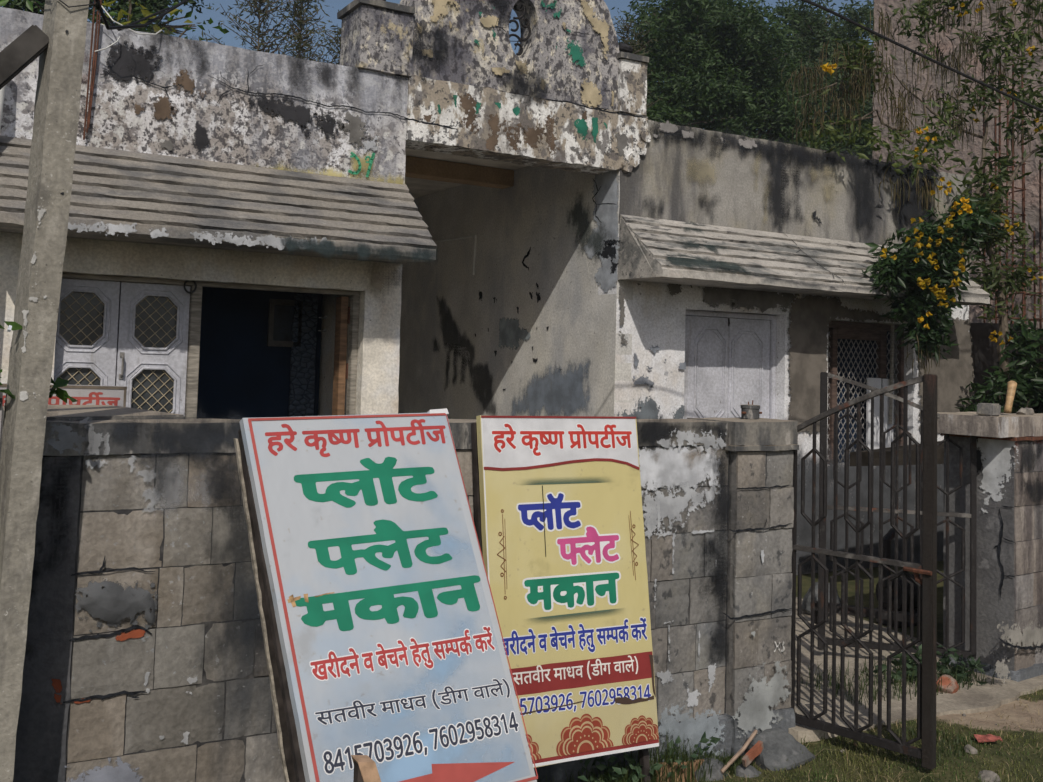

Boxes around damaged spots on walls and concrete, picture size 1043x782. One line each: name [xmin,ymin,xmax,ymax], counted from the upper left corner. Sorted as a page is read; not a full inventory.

peeling [453,93,580,155]
damp [650,124,938,231]
peeling [190,231,333,250]
damp [568,195,606,258]
damp [433,299,496,415]
damp [512,361,590,416]
peeling [638,446,720,540]
crack [71,557,155,576]
crack [994,506,1014,598]
crack [69,625,152,641]
crack [63,690,147,703]
peeling [657,652,791,762]